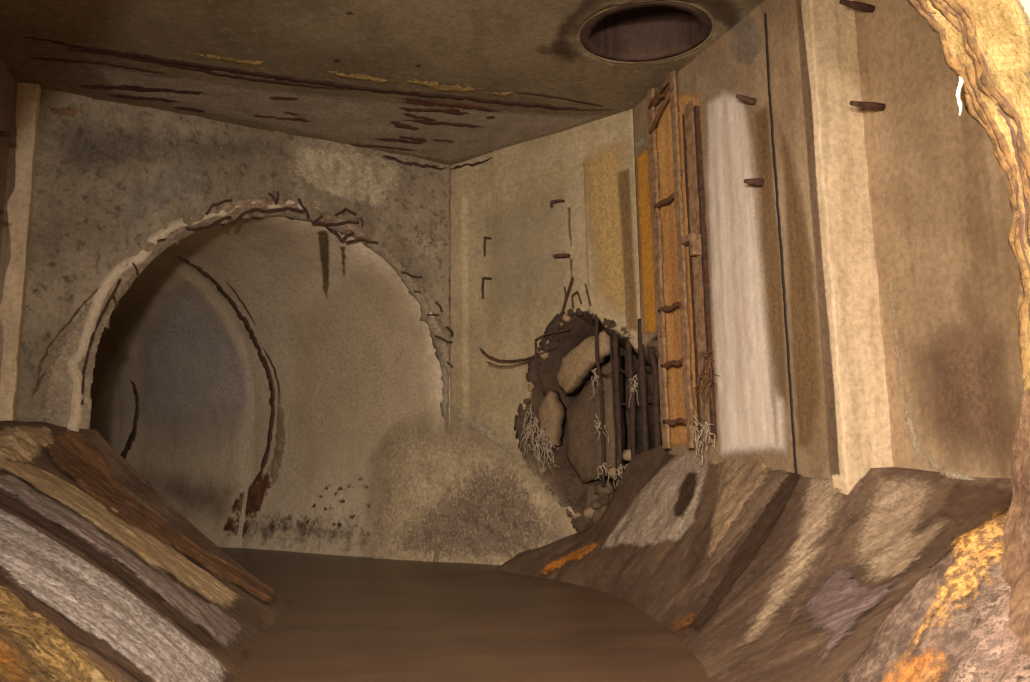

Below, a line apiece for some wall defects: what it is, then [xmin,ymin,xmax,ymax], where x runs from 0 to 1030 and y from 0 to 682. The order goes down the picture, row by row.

crack [178,256,275,486]
flaking render [43,96,501,414]
damp [270,392,285,484]
damp [262,516,349,542]
spalling [480,276,662,533]
rust [585,94,702,446]